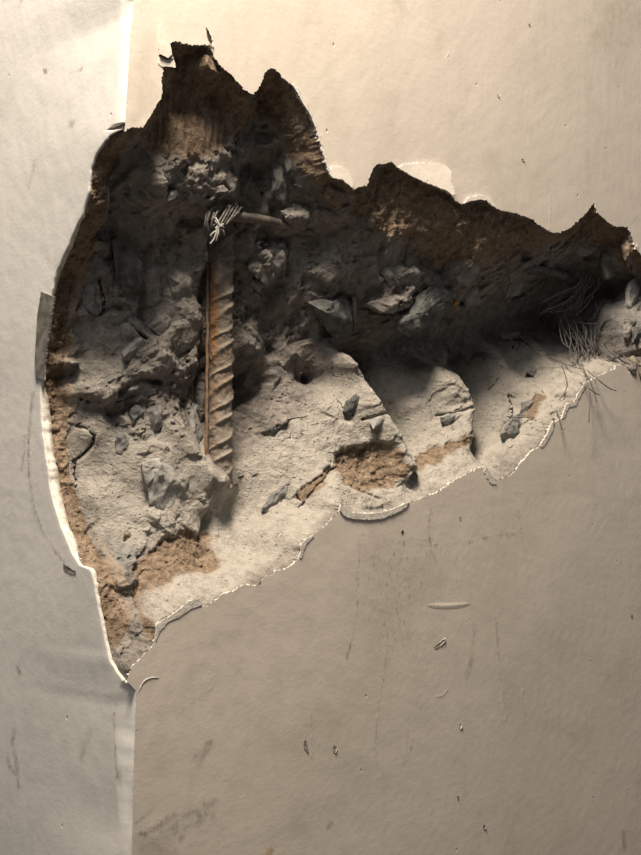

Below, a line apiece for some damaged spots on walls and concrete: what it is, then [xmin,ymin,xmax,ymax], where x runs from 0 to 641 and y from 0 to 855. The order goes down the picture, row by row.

spalling [35,23,641,679]